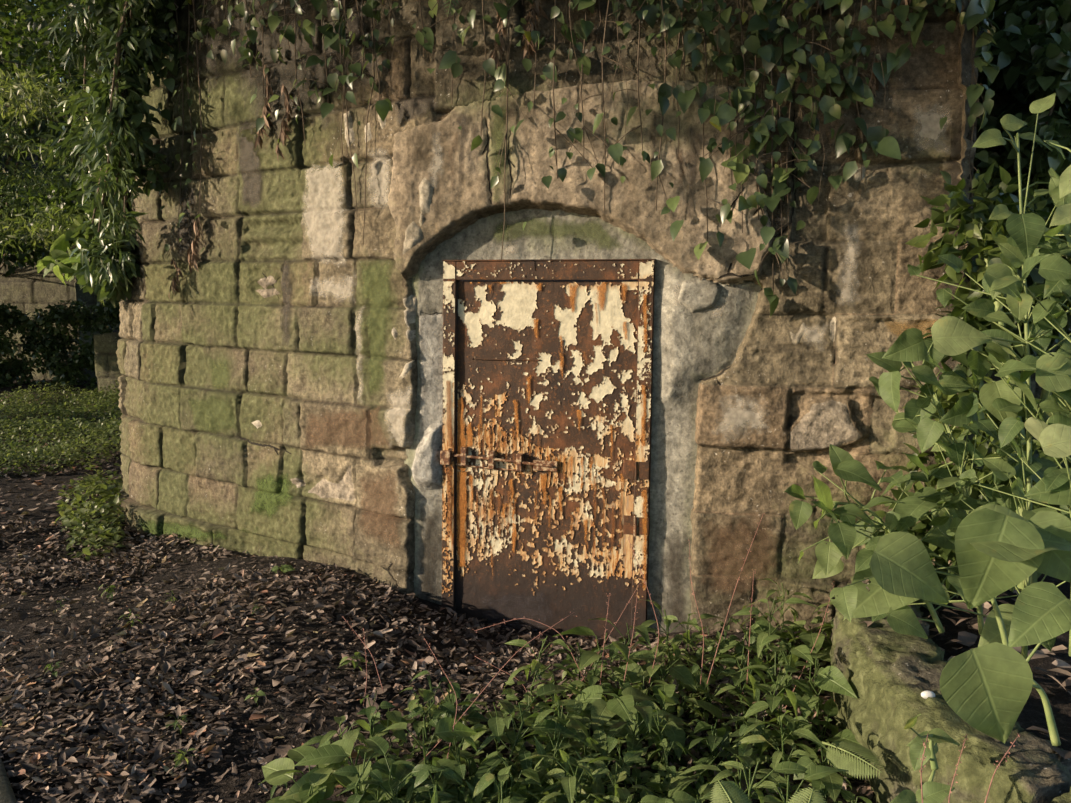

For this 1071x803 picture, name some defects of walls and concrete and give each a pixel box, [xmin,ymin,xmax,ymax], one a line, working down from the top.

leakage [304,165,345,263]
leakage [370,151,392,206]
leakage [310,263,390,392]
corrosion [595,282,606,322]
peeling [392,260,654,598]
corrosion [446,375,624,567]